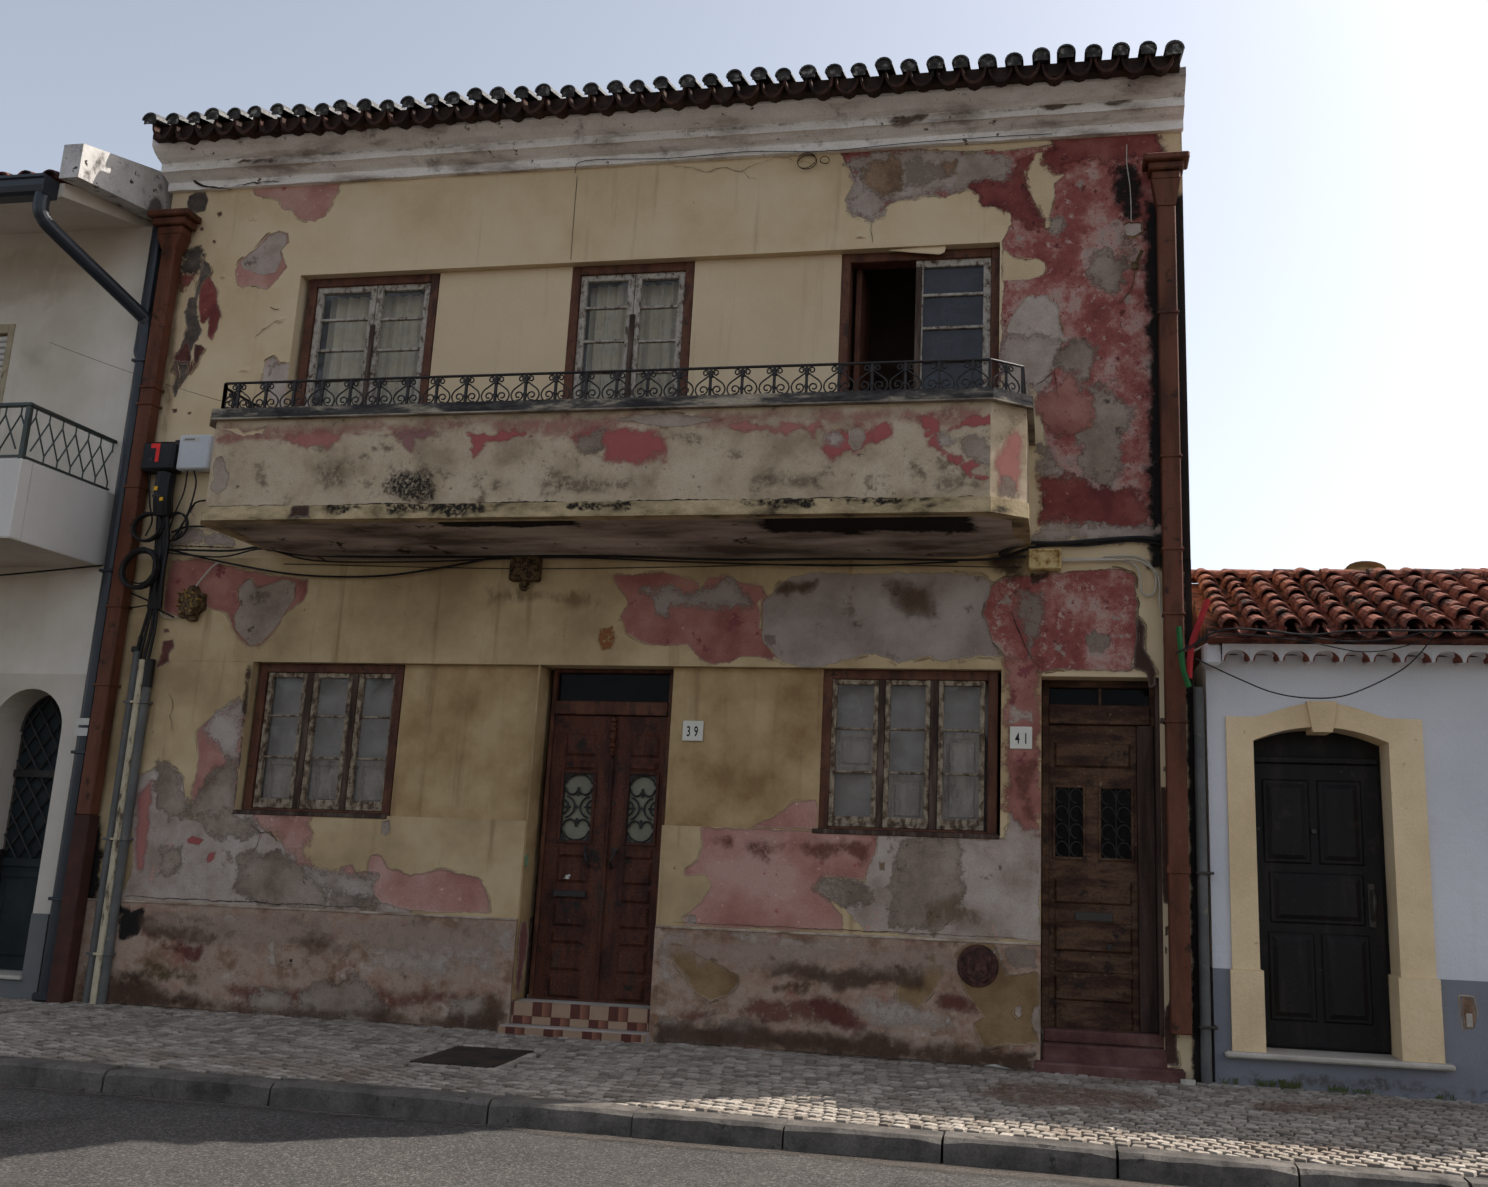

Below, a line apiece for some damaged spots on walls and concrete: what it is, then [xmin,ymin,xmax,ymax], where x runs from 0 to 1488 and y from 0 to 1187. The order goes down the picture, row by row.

peeling [170,192,223,414]
spalling [260,355,289,407]
spalling [235,184,341,289]
peeling [452,132,1182,546]
leakage [382,471,631,528]
spalling [155,528,310,669]
spalling [121,698,492,914]
spalling [610,566,1159,1051]
leakage [106,973,213,1008]
leakage [119,906,330,965]
leakage [348,922,513,1031]
leakage [657,933,1037,1067]